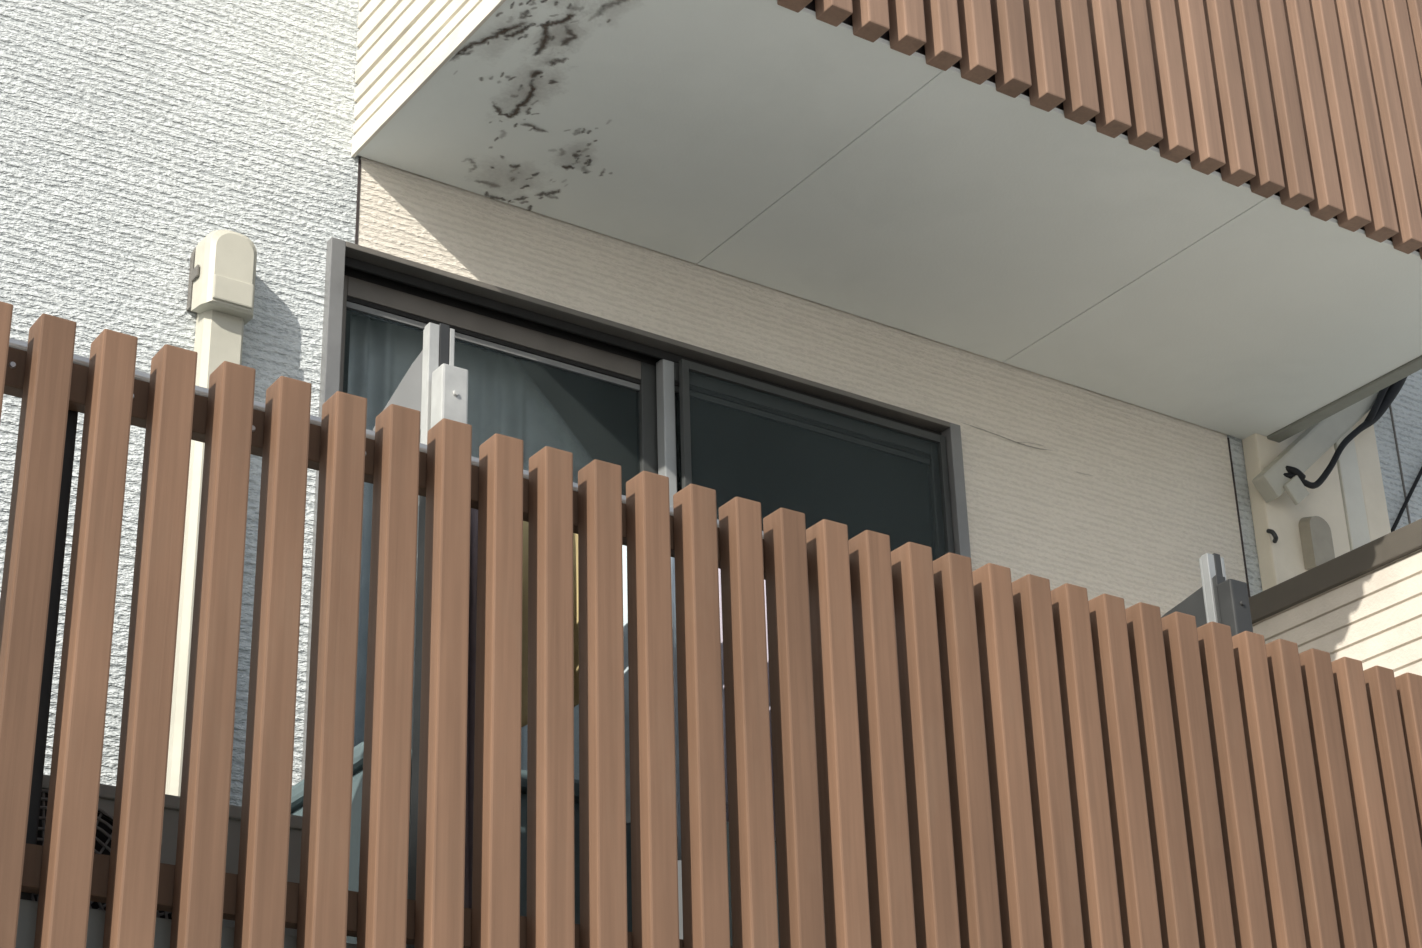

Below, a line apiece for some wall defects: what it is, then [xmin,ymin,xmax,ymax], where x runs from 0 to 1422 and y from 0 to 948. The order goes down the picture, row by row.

leakage [485,156,560,210]